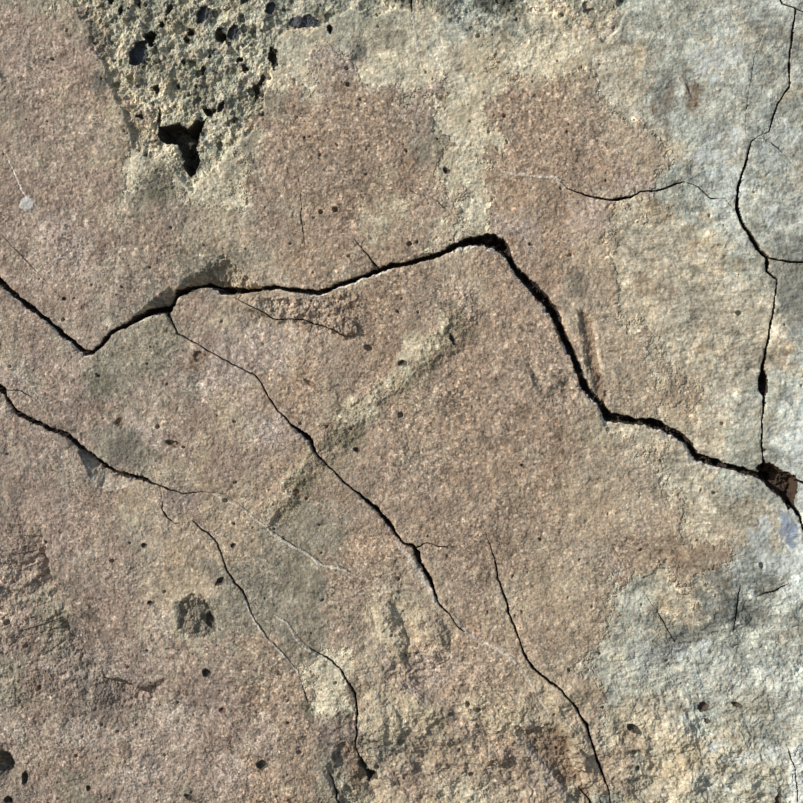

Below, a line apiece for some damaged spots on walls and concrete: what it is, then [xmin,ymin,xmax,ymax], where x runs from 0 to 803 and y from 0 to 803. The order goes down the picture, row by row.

spalling [73,0,628,192]
crack [498,168,714,202]
crack [735,0,803,462]
crack [0,233,759,803]
crack [733,584,787,630]
crack [786,500,803,531]